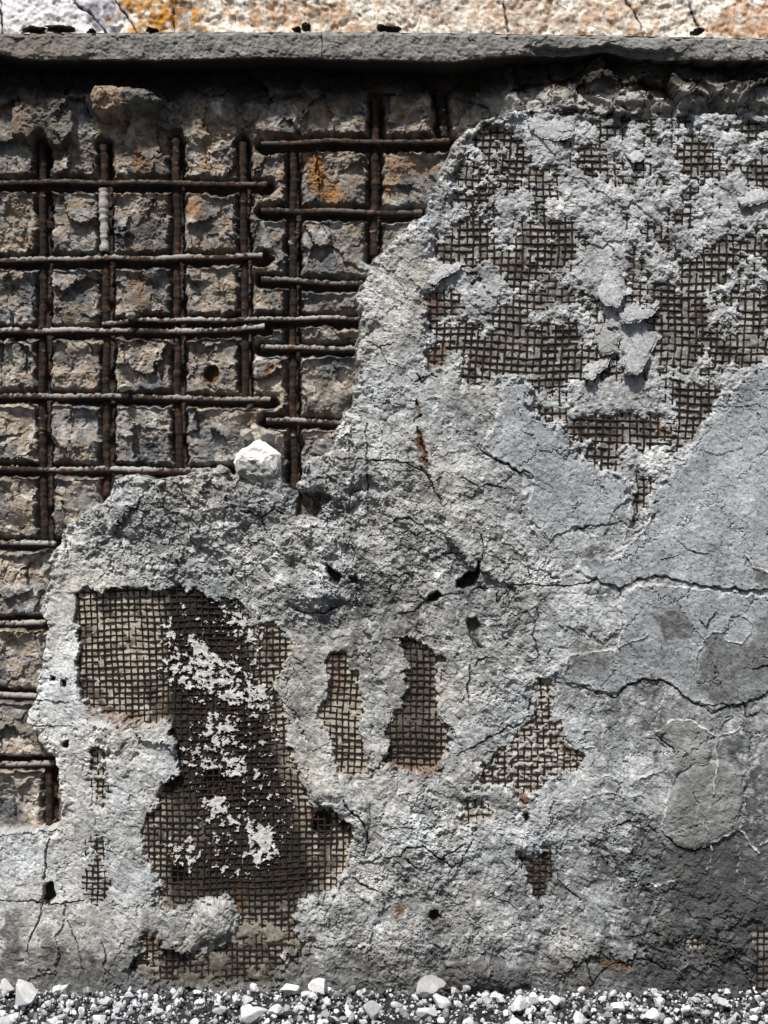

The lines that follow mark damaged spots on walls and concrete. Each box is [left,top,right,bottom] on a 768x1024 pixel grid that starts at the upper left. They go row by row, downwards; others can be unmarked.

corrosion [309,157,342,206]
corrosion [416,433,428,464]
crack [332,344,530,497]
spalling [421,110,768,831]
crack [395,534,765,662]
spalling [317,651,371,779]
spalling [383,635,453,774]
crack [551,679,764,718]
crack [0,830,113,976]
spalling [74,585,356,989]
crack [345,805,463,892]
spalling [515,845,564,908]